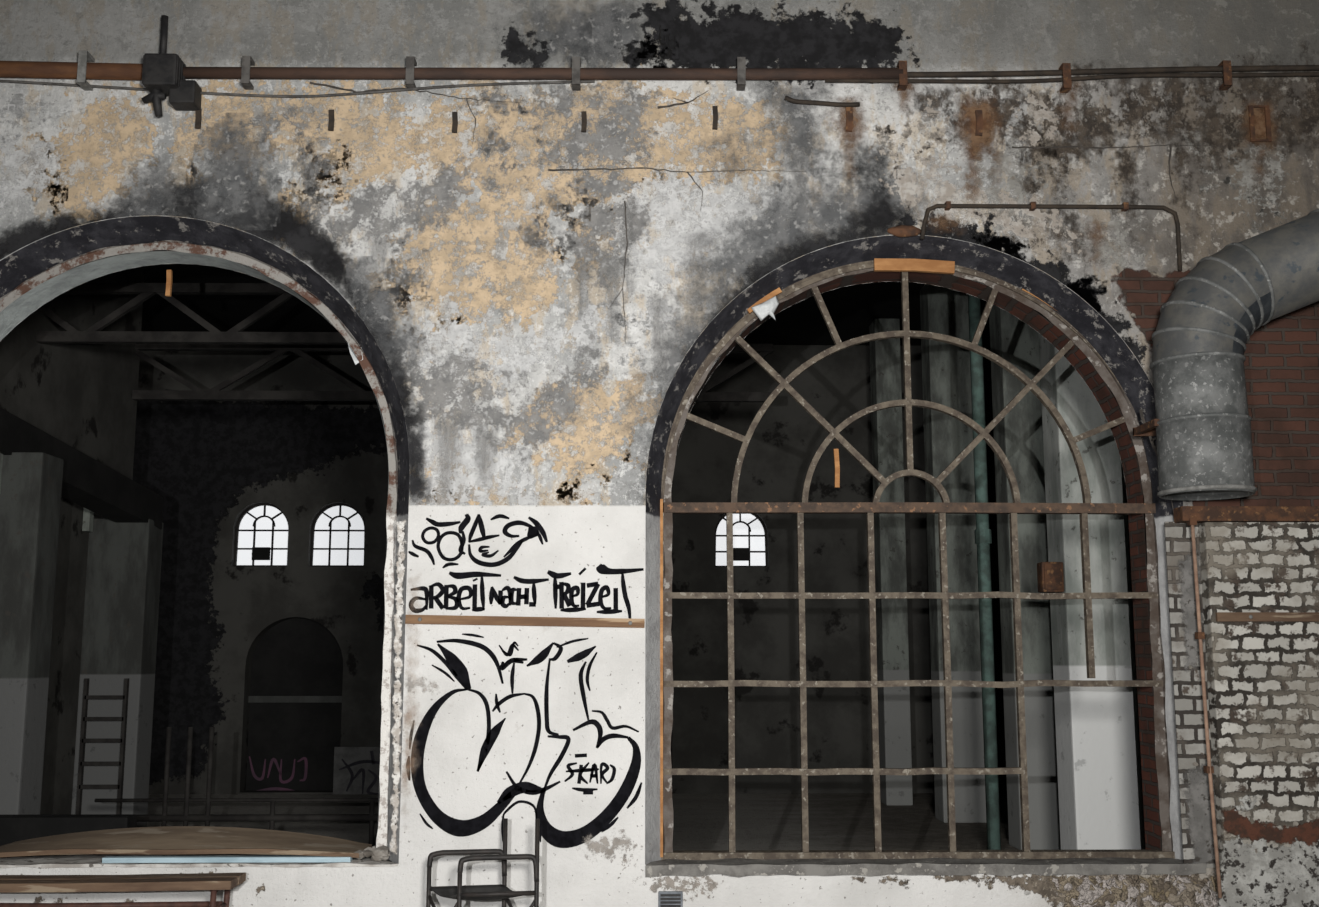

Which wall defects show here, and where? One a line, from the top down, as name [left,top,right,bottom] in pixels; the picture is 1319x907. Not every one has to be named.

water stain [119,163,173,217]
corrosion [961,98,1000,191]
water stain [914,45,1319,261]
peeling [0,63,833,505]
flaking render [852,876,908,888]
peeling [934,795,1319,907]